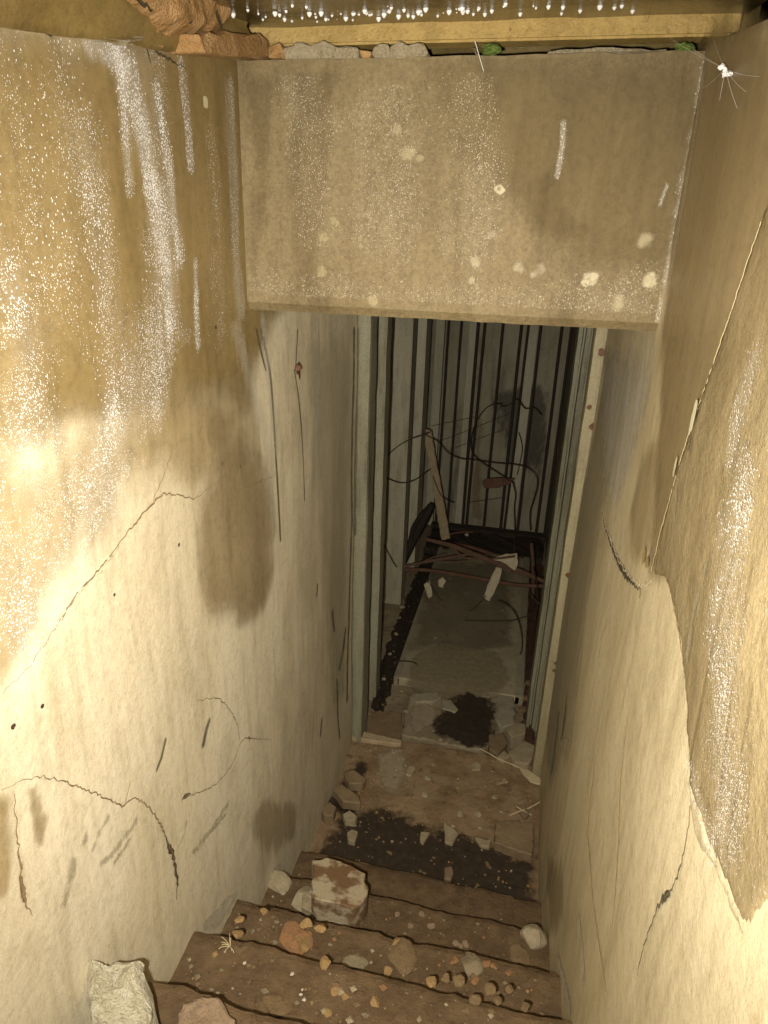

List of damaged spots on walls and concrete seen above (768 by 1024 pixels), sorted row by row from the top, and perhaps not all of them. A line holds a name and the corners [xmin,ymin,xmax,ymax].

water stain [0,22,768,740]
crack [3,329,305,694]
crack [602,512,685,679]
crack [182,697,269,800]
crack [5,775,179,915]